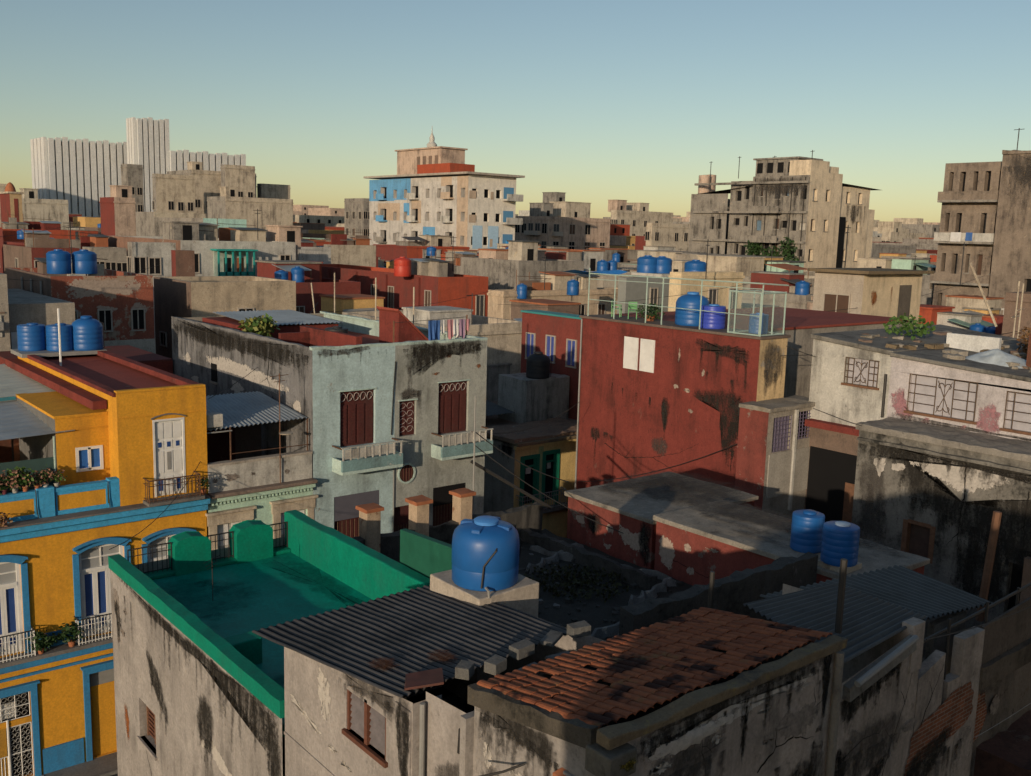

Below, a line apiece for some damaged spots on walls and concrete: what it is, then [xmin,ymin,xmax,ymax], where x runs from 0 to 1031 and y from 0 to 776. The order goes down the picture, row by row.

peeling [64,279,147,318]
damp [402,341,481,400]
damp [697,339,747,386]
damp [649,397,668,429]
peeling [891,389,910,419]
peeling [604,524,645,552]
peeling [659,535,692,570]
damp [862,444,1031,601]
damp [114,582,281,776]
damp [479,708,558,776]
crack [757,732,810,773]
flaking render [903,682,1000,776]